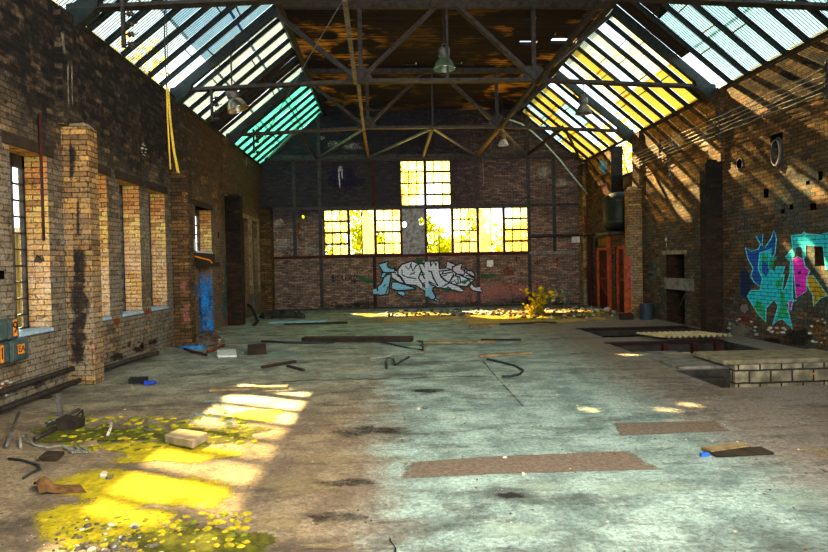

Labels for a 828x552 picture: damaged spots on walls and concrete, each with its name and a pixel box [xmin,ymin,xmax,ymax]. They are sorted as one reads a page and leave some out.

water stain [69,246,91,364]